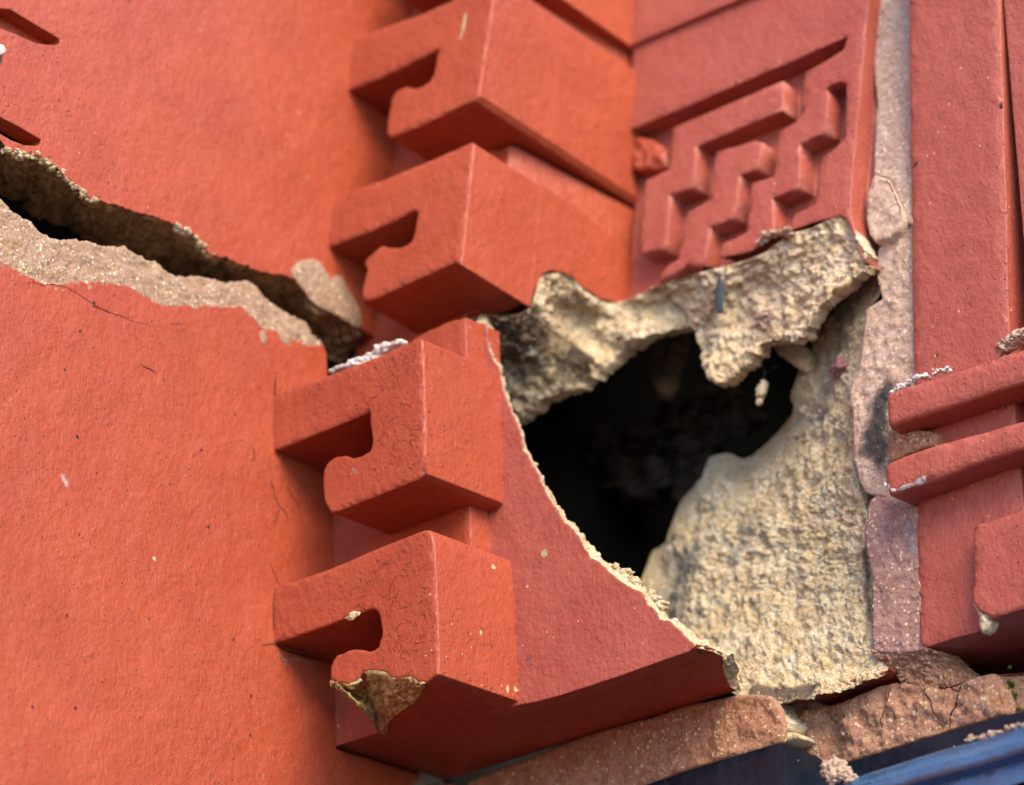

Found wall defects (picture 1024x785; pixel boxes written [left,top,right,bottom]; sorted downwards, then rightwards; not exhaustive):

crack [27,279,182,327]
spalling [476,315,710,647]
spalling [330,670,427,734]
crack [880,680,967,729]